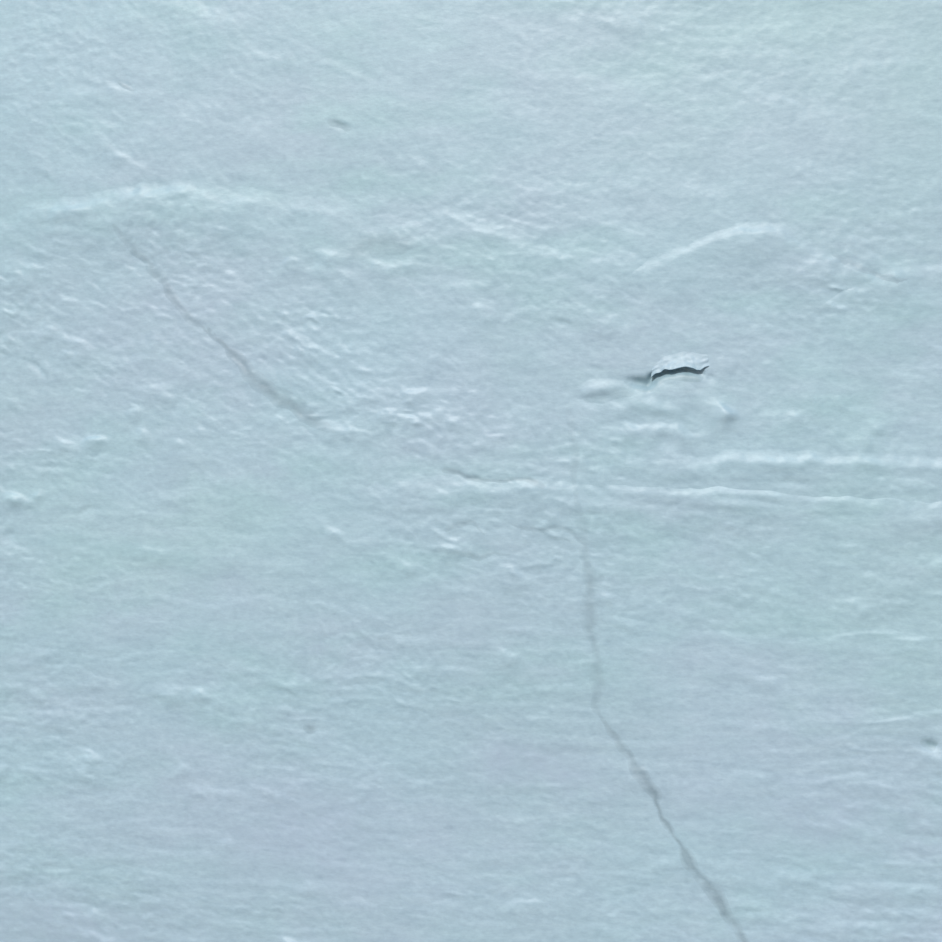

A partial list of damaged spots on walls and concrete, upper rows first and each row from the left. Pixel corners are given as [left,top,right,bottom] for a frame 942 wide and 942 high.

flaking render [573,351,709,404]
crack [441,467,545,489]
crack [443,519,510,561]
crack [509,408,750,942]